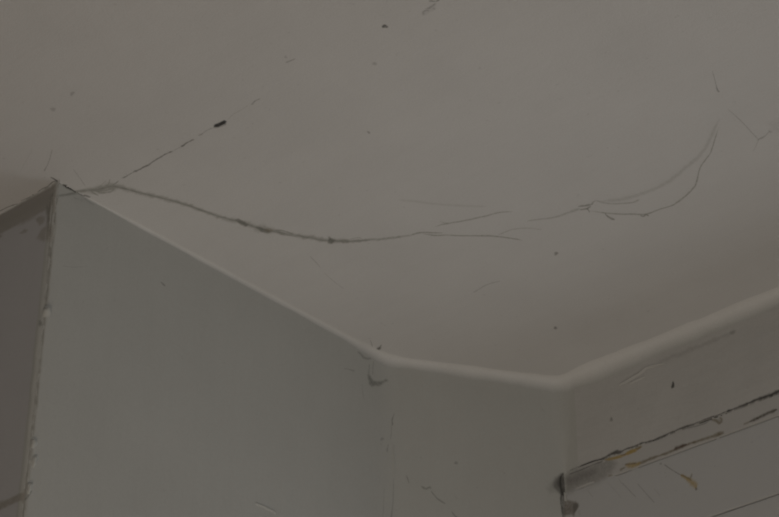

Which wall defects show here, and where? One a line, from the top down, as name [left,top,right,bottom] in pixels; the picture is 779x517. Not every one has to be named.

crack [50,105,769,245]
crack [563,389,779,475]